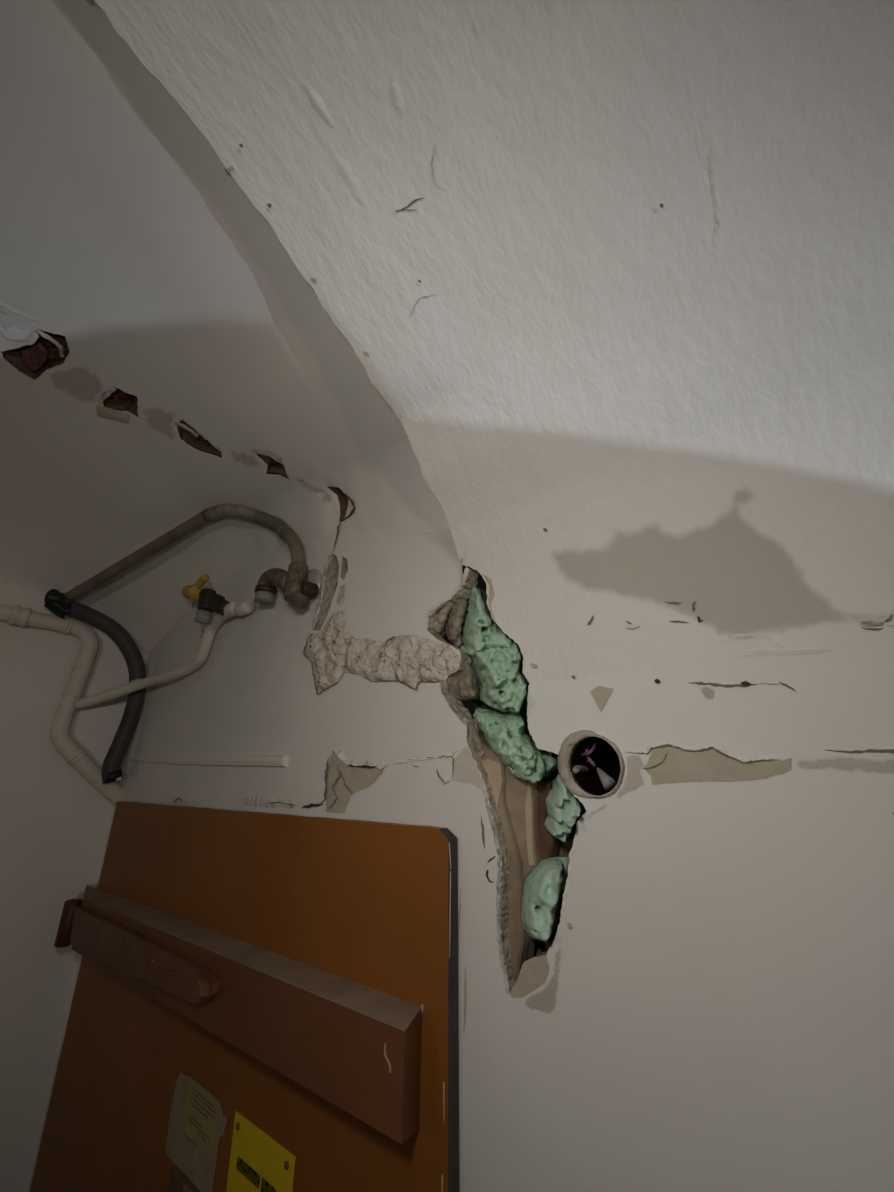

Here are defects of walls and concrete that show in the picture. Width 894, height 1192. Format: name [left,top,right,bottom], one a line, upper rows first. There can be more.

flaking render [1,329,70,380]
flaking render [96,386,138,424]
flaking render [174,420,222,456]
flaking render [252,449,288,478]
flaking render [327,486,356,522]
peeling [590,686,613,711]
peeling [303,552,586,997]
peeling [619,740,894,797]